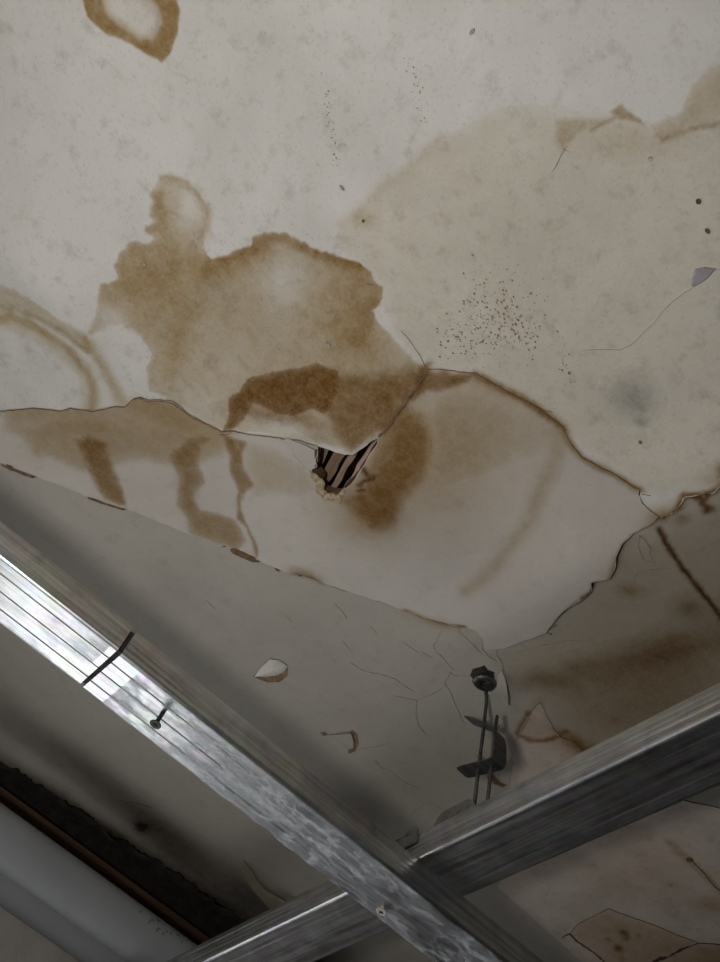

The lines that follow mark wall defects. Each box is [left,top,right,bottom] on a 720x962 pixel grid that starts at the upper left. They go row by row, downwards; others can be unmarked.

water stain [436,264,548,367]
crack [1,397,316,473]
spalling [281,438,378,504]
crack [378,334,660,517]
crack [344,625,591,731]
peeling [509,702,585,789]
peeling [498,800,720,962]